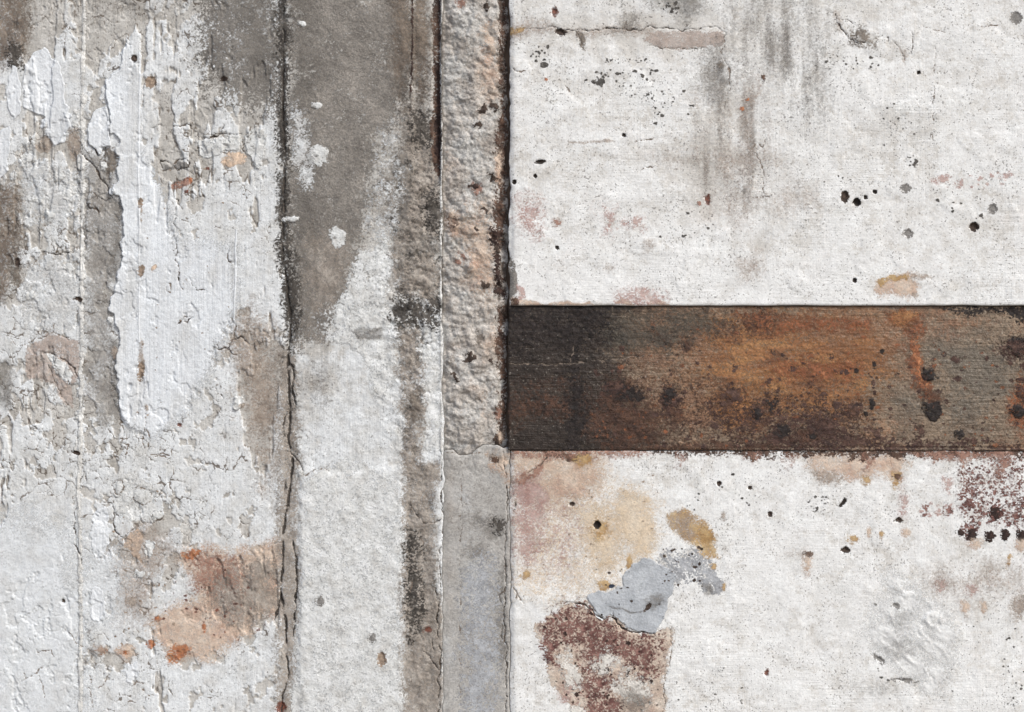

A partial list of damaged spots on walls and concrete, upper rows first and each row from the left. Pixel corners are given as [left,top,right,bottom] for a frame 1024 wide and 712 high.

peeling [0,43,281,466]
spalling [183,0,329,191]
crack [274,13,327,712]
leakage [272,0,444,712]
leakage [650,0,700,18]
corrosion [445,0,1024,593]
corrosion [91,517,286,664]
spalling [533,546,724,712]